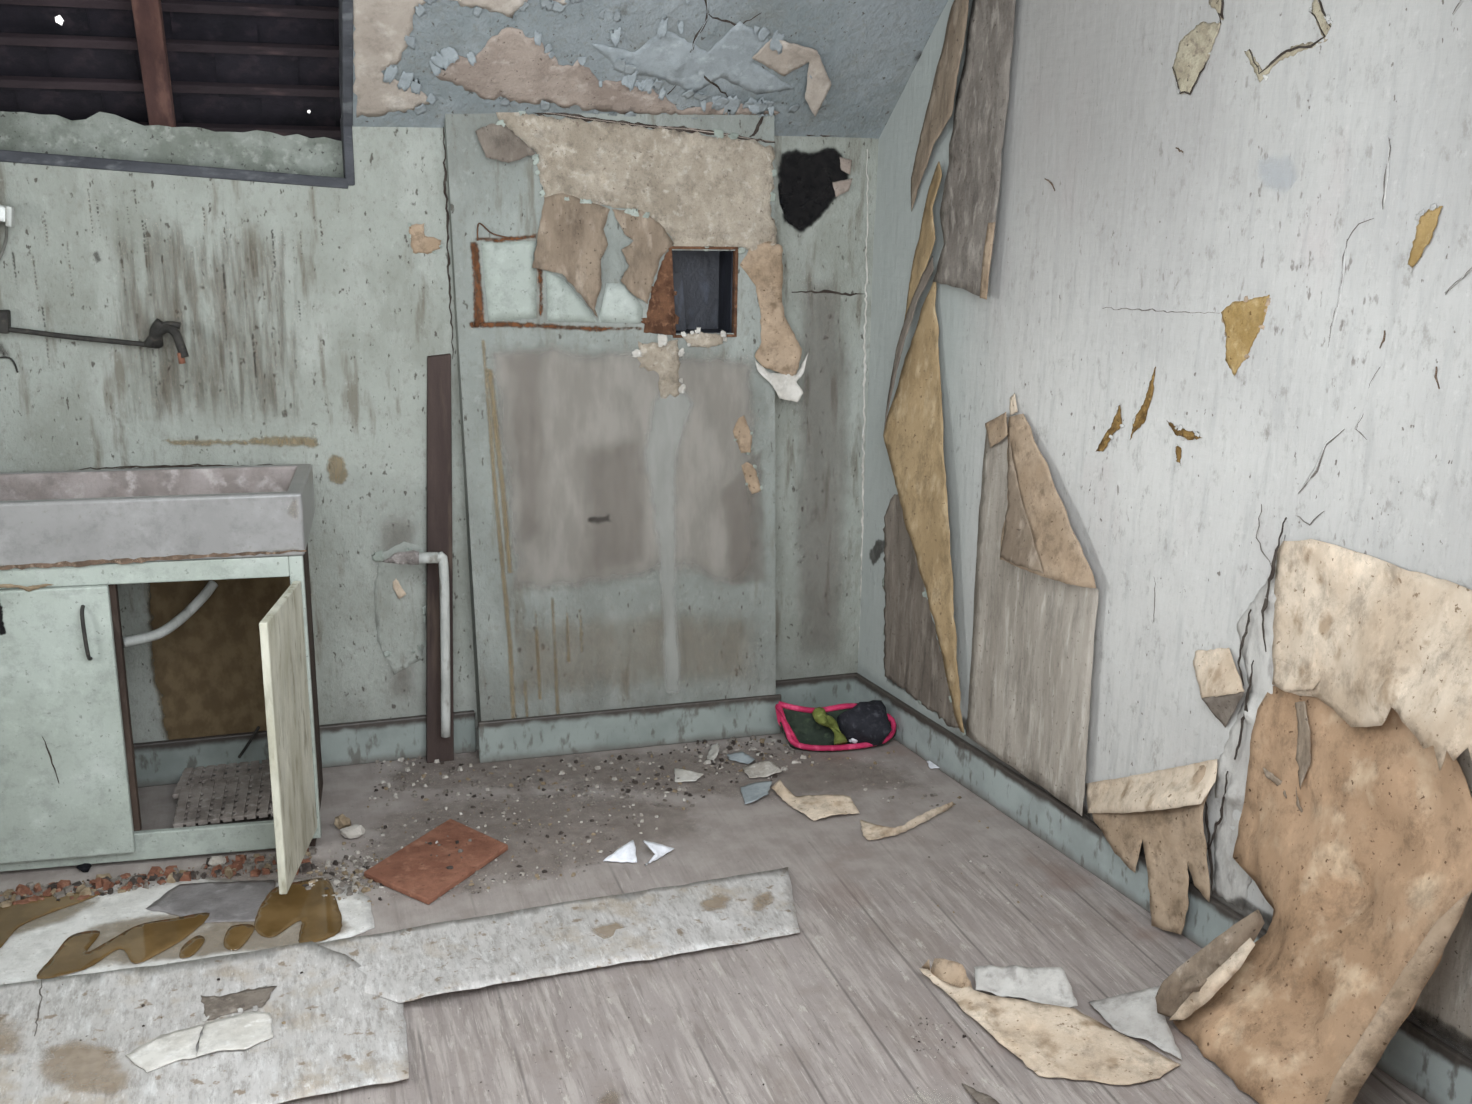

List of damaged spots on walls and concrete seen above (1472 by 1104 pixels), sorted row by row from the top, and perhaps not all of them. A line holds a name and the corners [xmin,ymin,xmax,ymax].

crack [535,0,830,143]
rust [469,235,680,335]
flaking render [353,0,853,402]
crack [792,149,869,648]
peeling [1221,295,1271,376]
peeling [1408,203,1443,273]
peeling [882,494,966,736]
peeling [1456,748,1472,797]
leakage [146,880,276,923]
peeling [1414,893,1472,1040]